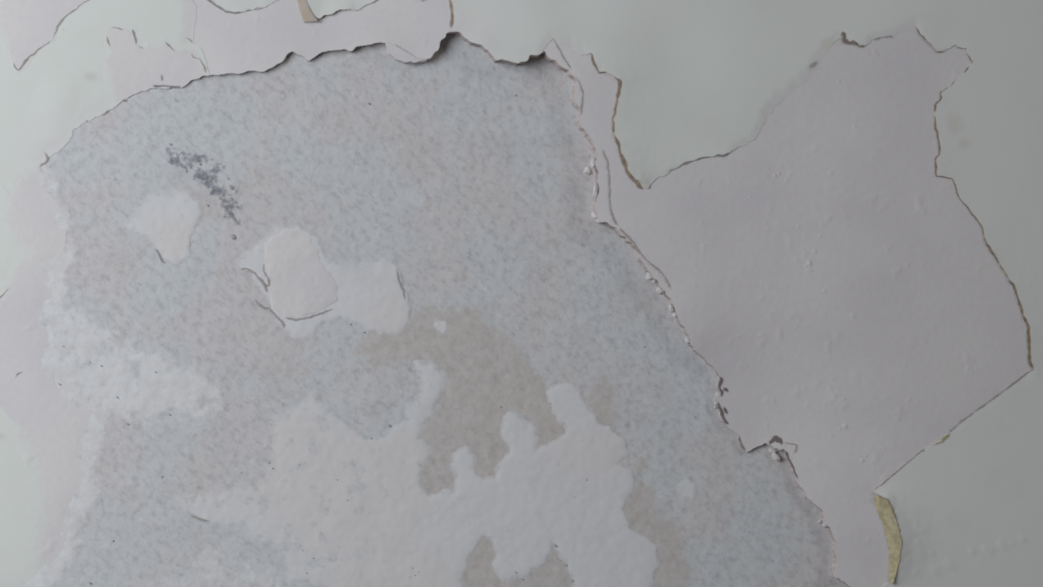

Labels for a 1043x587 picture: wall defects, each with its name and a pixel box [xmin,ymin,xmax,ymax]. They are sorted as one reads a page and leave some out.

crack [13,0,88,71]
crack [208,0,262,14]
crack [447,0,455,27]
crack [841,32,891,47]
flaking render [49,0,848,587]
peeling [541,27,1034,587]
crack [876,28,1033,489]